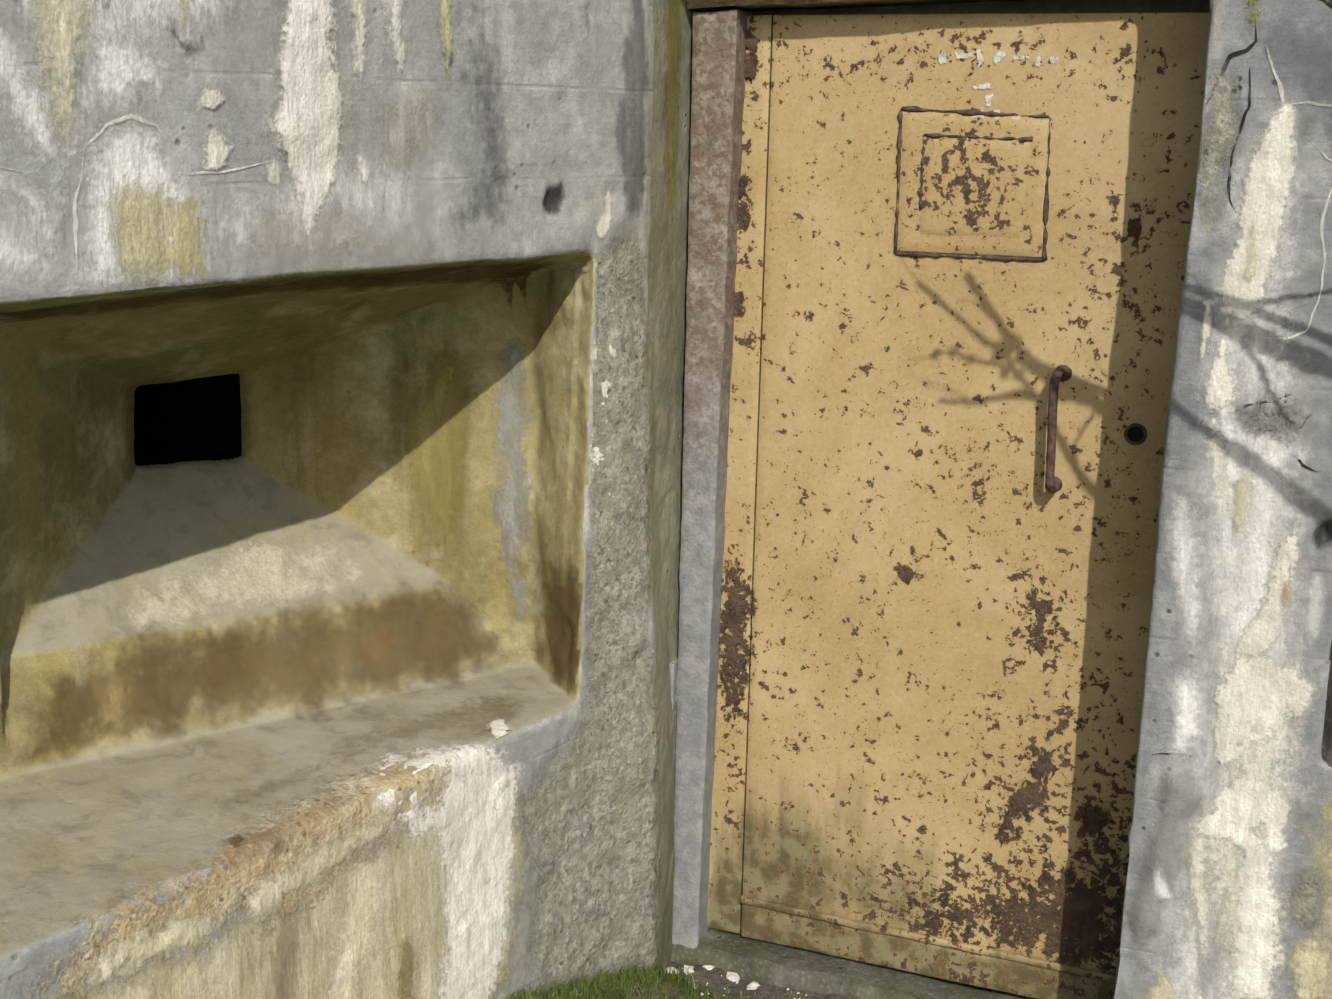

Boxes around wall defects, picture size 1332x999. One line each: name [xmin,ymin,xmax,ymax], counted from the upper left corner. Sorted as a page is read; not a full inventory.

damp [0,0,405,285]
damp [440,0,452,72]
corrosion [737,173,751,230]
crack [1206,22,1257,213]
crack [1259,146,1332,340]
damp [493,345,531,618]
corrosion [717,552,759,720]
corrosion [897,564,918,585]
corrosion [1026,584,1064,660]
damp [29,741,525,999]
corrosion [894,804,1129,984]
corrosion [994,729,1065,845]